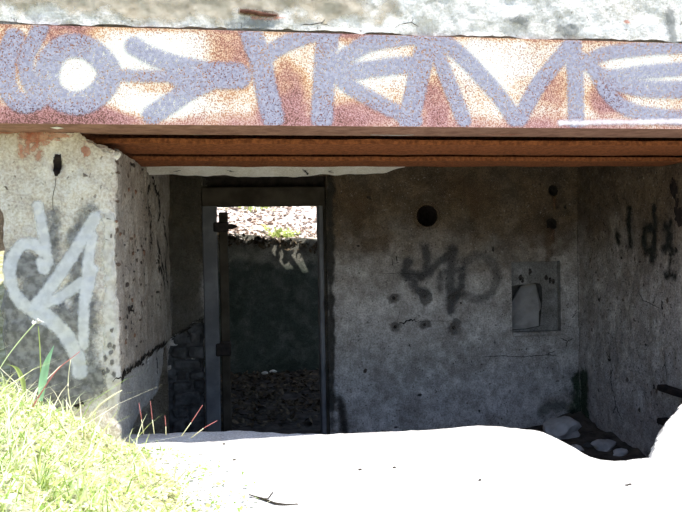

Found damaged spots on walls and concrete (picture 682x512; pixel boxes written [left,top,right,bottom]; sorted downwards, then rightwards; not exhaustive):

rust [0,132,69,161]
crack [113,319,200,383]